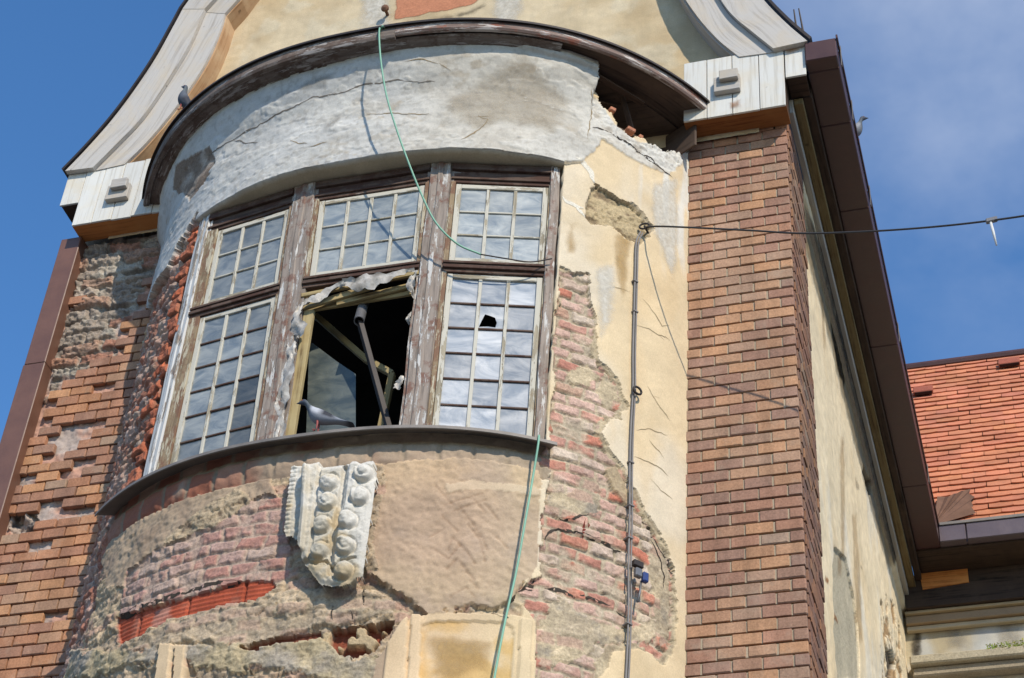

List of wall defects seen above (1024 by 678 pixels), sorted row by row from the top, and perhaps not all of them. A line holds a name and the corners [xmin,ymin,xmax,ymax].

crack [210,58,451,155]
spalling [597,74,645,138]
flaking render [585,183,655,245]
flaking render [42,145,412,678]
flaking render [519,265,679,678]
crack [638,387,670,497]
spalling [8,514,40,534]
crack [641,518,673,587]